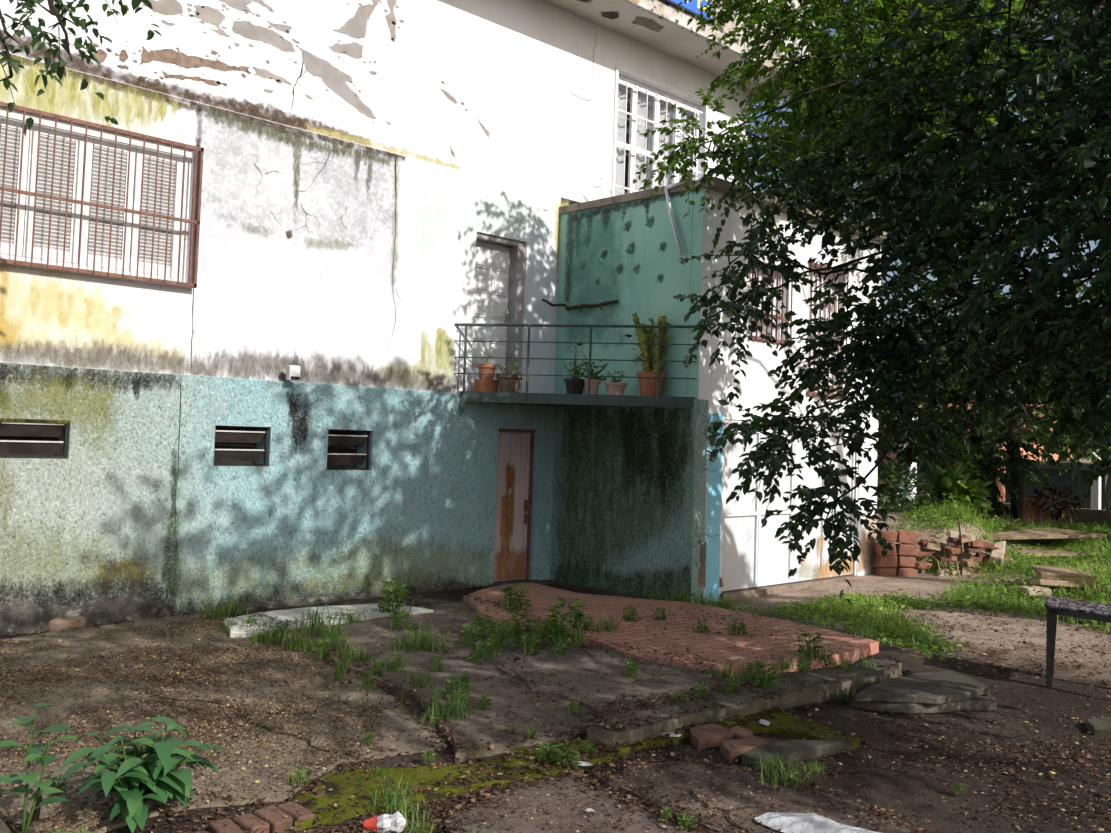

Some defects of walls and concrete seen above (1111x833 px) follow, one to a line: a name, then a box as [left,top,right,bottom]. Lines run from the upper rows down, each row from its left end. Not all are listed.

leakage [0,31,405,207]
peeling [78,0,404,125]
peeling [440,81,490,138]
spalling [577,0,665,32]
crack [254,148,348,232]
leakage [0,269,455,453]
corrosion [496,464,526,581]
leakage [0,570,480,615]